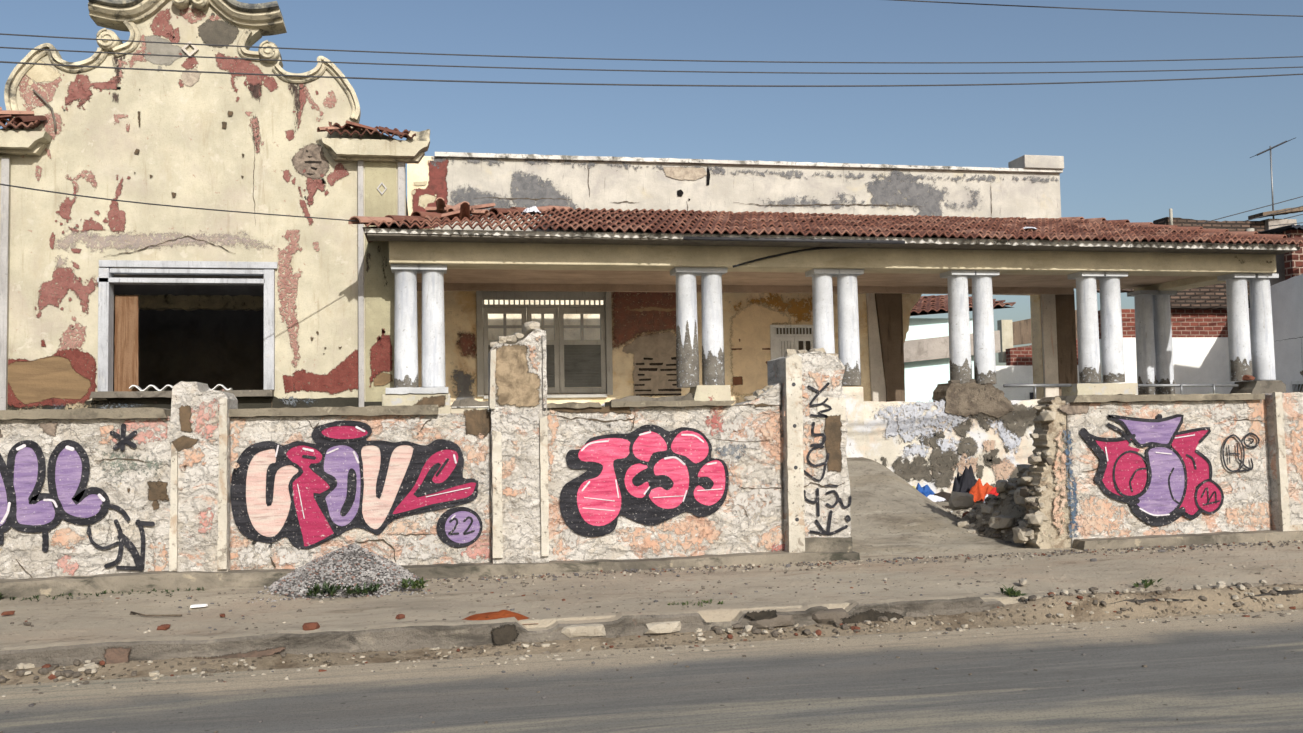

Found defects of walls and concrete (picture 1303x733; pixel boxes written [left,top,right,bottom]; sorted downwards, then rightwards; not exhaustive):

peeling [8,7,791,560]
peeling [950,358,997,384]
spalling [1060,402,1090,415]
peeling [1079,365,1175,395]
peeling [1194,356,1268,449]
peeling [874,399,1037,492]
peeling [229,532,313,570]
peeling [1044,428,1131,537]
peeling [1158,519,1189,533]
peeling [1225,475,1272,529]